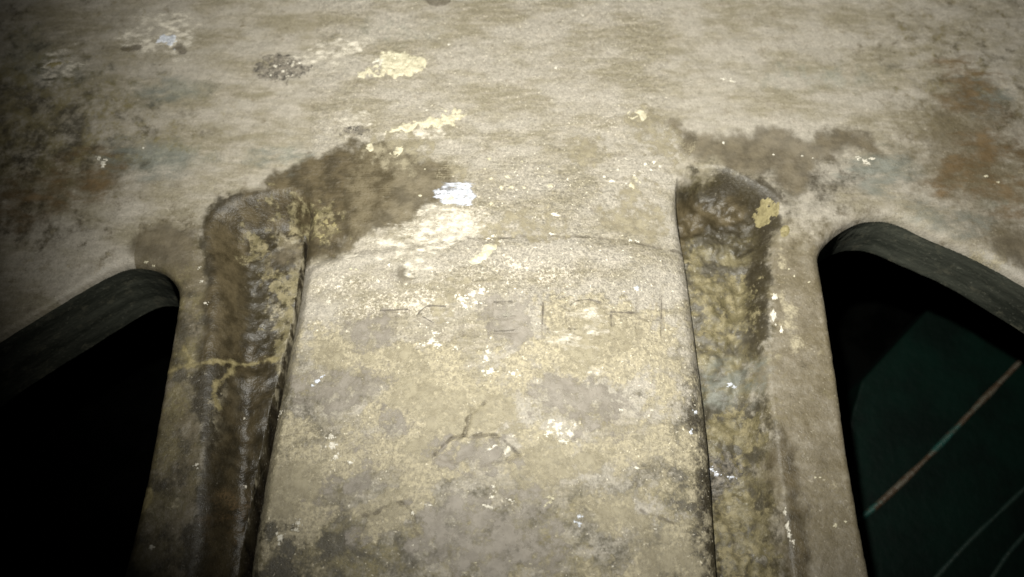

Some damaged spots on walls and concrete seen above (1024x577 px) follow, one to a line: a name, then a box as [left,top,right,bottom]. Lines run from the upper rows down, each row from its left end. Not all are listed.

peeling [253,53,312,83]
damp [683,130,900,194]
damp [676,190,747,252]
damp [198,110,486,577]
crack [168,346,278,410]
damp [768,440,810,577]